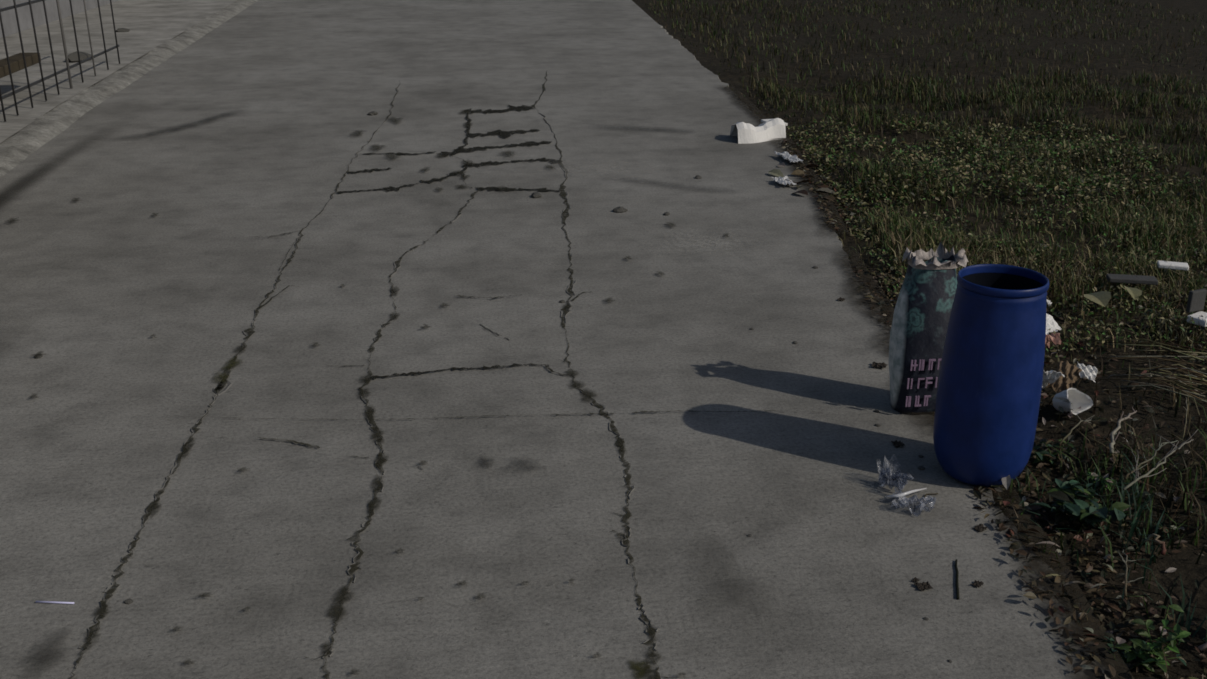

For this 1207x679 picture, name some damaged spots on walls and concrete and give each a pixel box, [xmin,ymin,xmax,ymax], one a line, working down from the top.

crack [68,72,823,679]